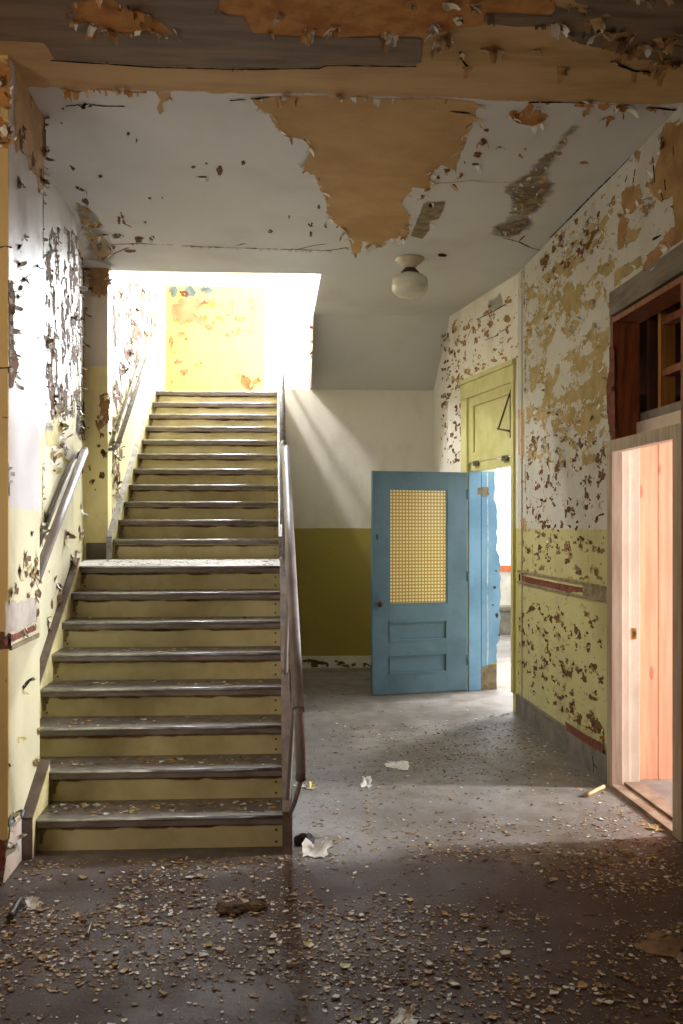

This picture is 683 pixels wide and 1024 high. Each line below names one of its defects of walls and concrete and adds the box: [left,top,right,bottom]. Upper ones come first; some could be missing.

peeling [0,0,683,87]
peeling [250,95,503,258]
peeling [507,103,549,135]
peeling [574,101,656,127]
peeling [0,59,255,649]
peeling [441,116,683,593]
flaking render [517,602,605,752]